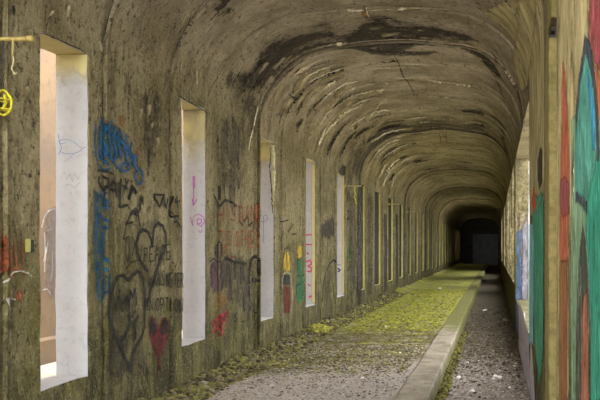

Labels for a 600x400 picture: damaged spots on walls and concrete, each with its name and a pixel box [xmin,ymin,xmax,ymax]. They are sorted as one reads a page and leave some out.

crack [279,56,431,181]
leakage [217,0,536,191]